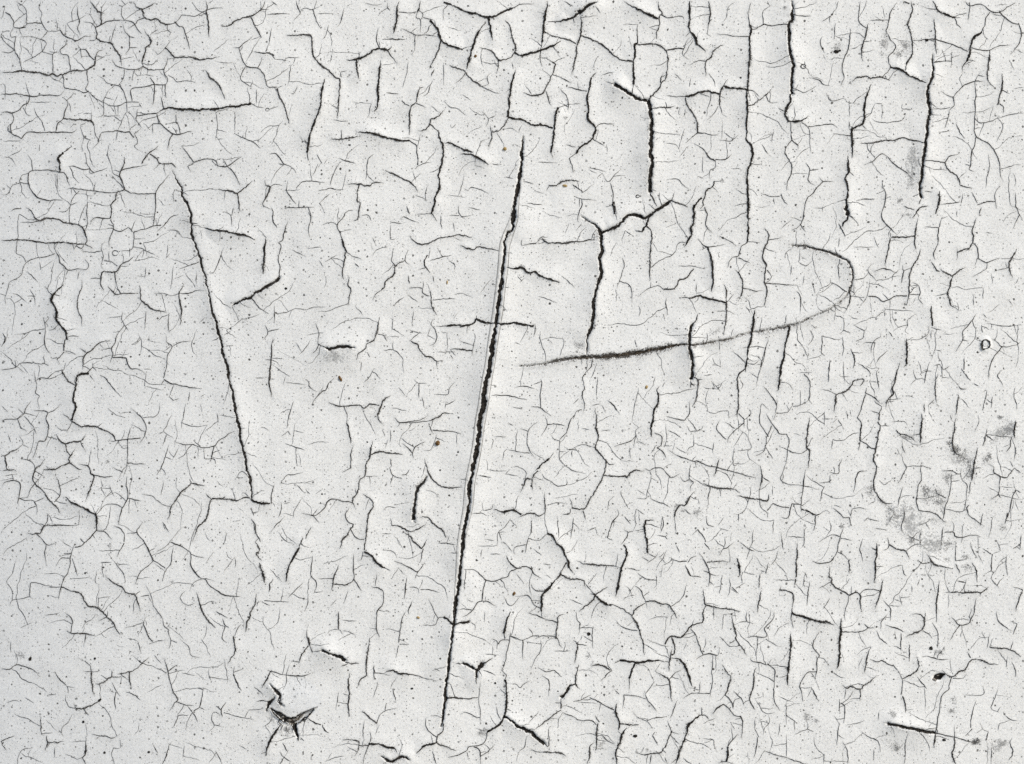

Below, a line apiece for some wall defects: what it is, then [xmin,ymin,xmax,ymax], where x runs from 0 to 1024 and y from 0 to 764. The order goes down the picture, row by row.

crack [1,0,381,695]
crack [291,207,564,380]
crack [337,0,1023,764]
crack [286,382,465,610]
crack [17,715,66,754]
crack [56,656,216,727]
crack [154,743,222,763]
crack [211,577,435,764]